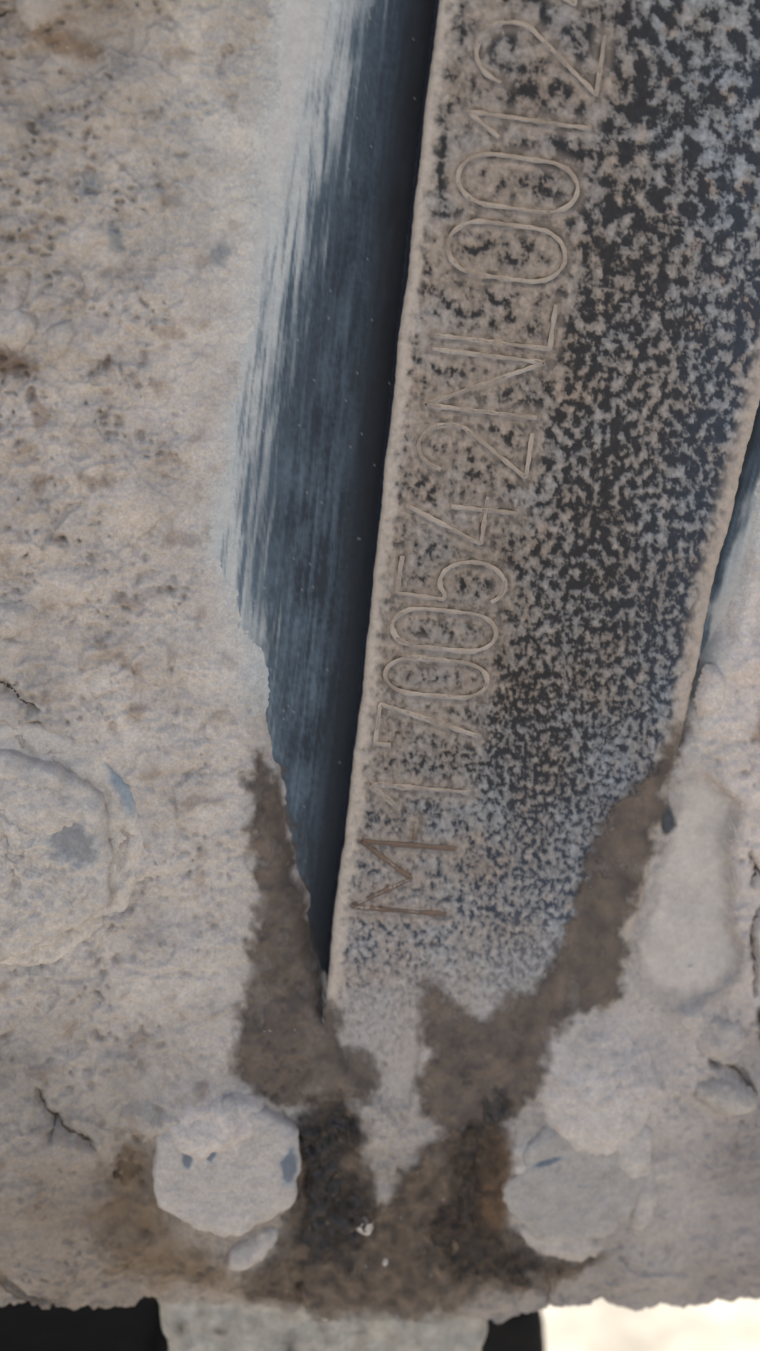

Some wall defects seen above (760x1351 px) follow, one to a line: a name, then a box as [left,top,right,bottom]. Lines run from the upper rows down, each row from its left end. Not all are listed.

water stain [235,729,684,1322]
crack [750,912,758,973]